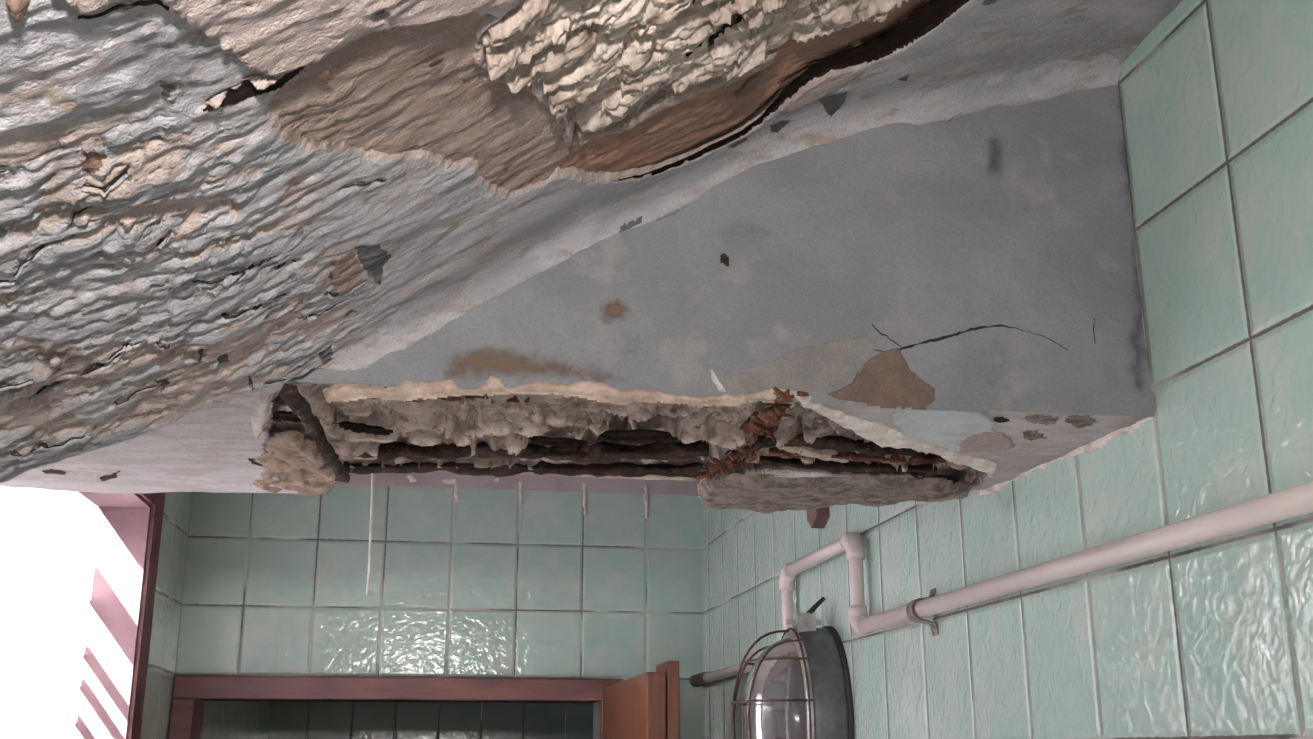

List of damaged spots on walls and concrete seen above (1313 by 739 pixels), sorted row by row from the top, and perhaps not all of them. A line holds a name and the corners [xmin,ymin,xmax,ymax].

spalling [0,0,31,22]
flaking render [65,0,124,16]
crack [78,0,170,19]
crack [708,16,745,47]
spalling [160,0,997,192]
peeling [81,149,107,173]
crack [0,166,171,287]
crack [193,256,366,325]
crack [872,319,1096,352]
crack [0,341,171,407]
spalling [248,334,1096,514]
crack [0,430,93,459]